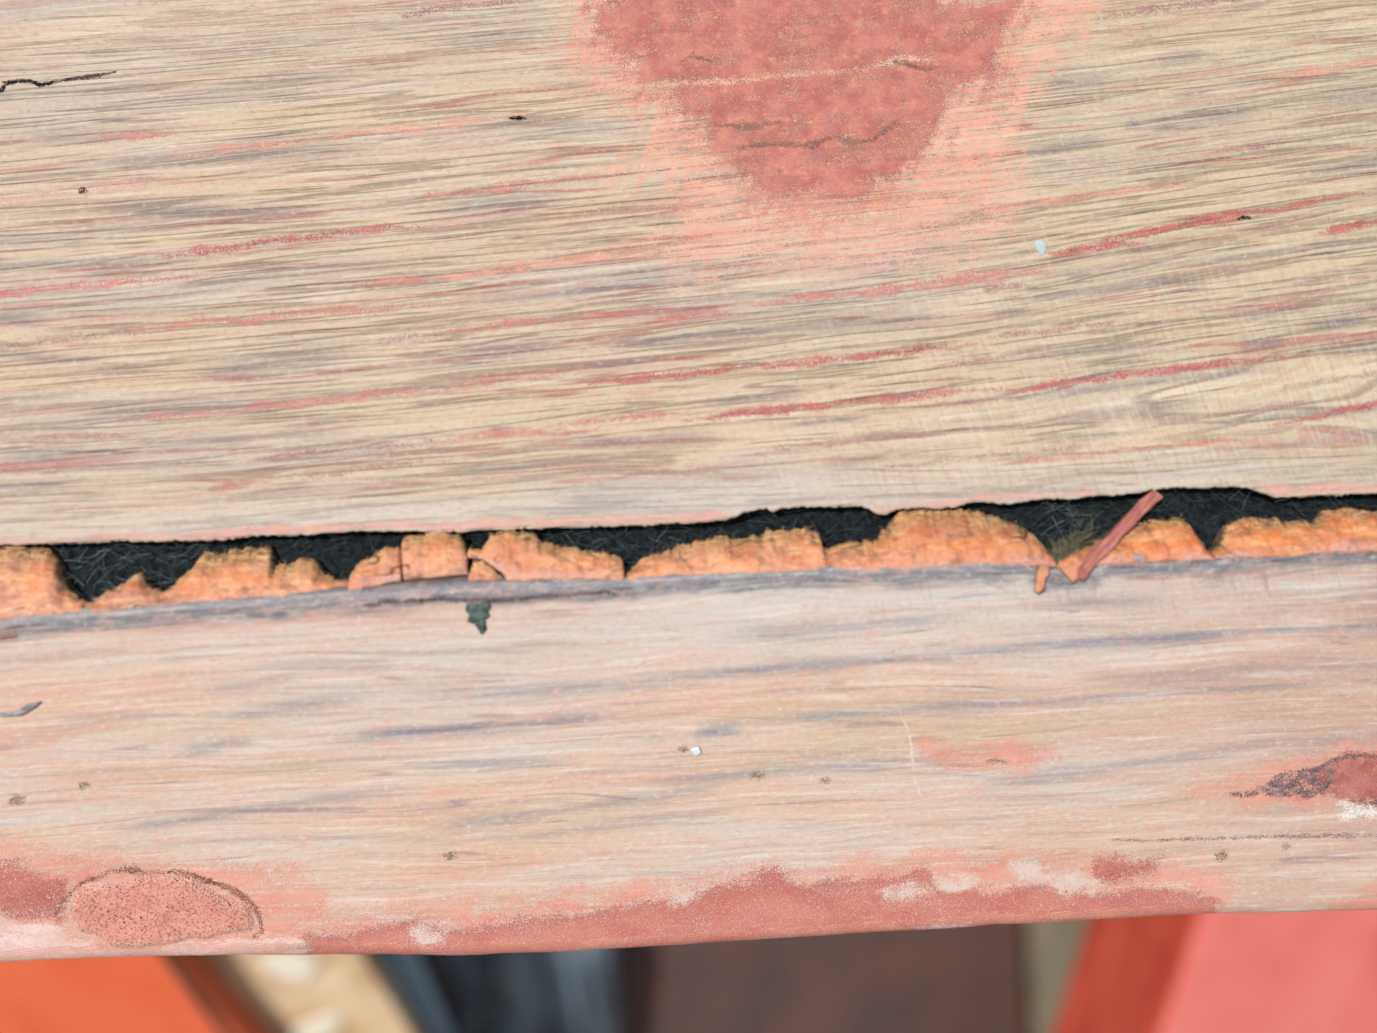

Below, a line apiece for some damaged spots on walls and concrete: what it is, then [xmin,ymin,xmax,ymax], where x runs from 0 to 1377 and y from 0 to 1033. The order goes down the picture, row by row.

peeling [246,0,541,34]
crack [0,71,116,93]
peeling [584,188,1377,387]
peeling [372,307,734,346]
peeling [247,354,1306,483]
crack [363,590,618,608]
crack [0,627,17,642]
peeling [1176,730,1377,830]
peeling [0,830,1240,962]